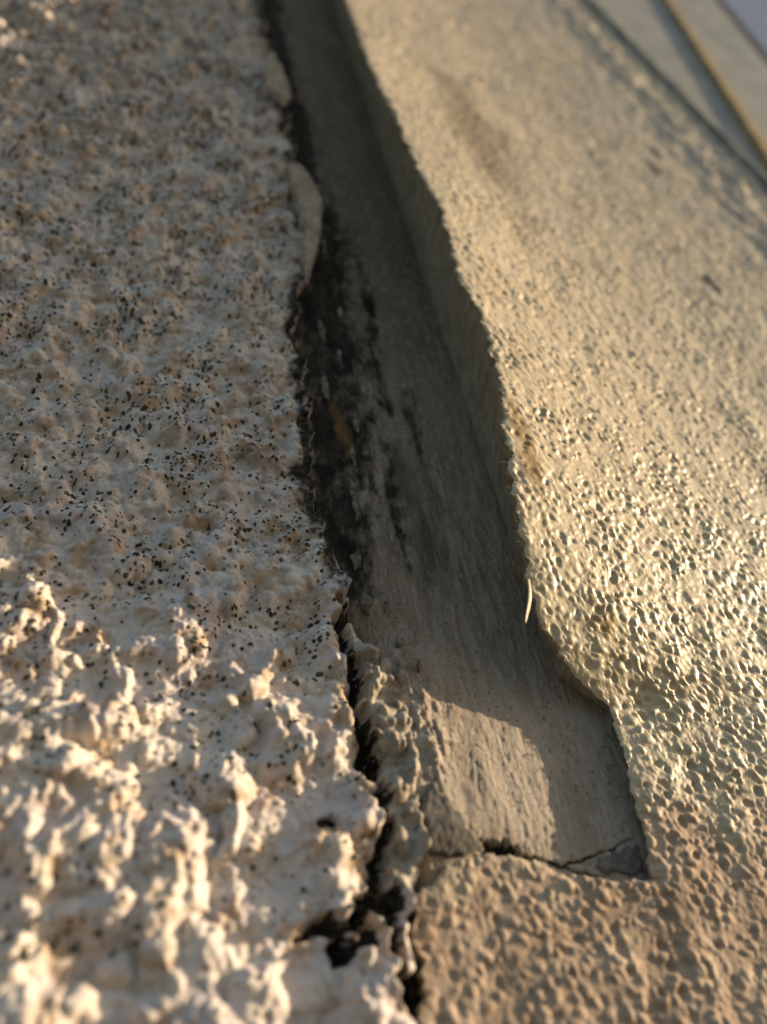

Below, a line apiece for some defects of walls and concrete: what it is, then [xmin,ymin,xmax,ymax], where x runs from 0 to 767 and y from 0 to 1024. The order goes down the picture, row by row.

water stain [0,0,422,811]
spalling [259,0,654,1024]
water stain [6,933,34,964]
water stain [50,917,86,959]
crack [292,600,413,1009]
crack [480,839,632,878]